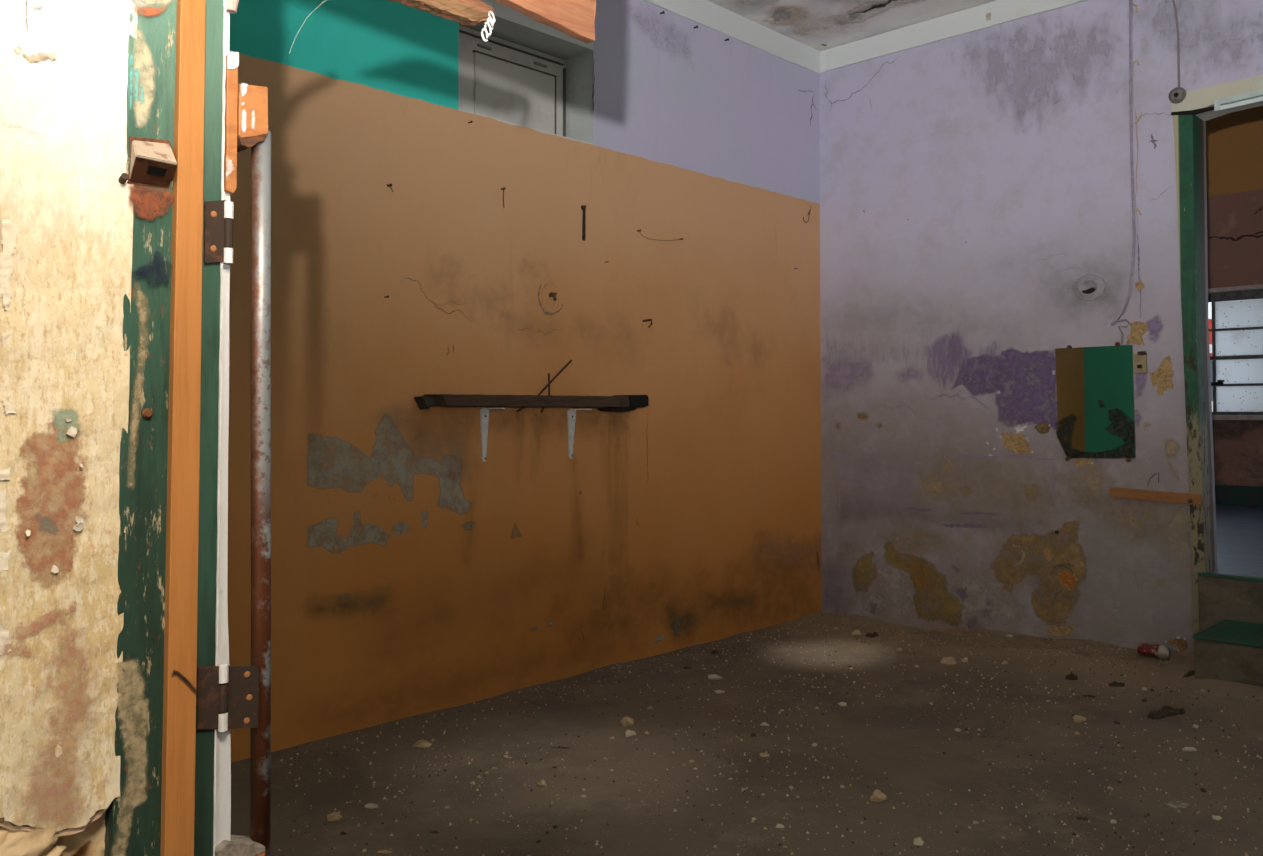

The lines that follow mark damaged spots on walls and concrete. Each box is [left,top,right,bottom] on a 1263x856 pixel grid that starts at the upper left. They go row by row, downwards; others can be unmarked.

peeling [134,23,154,126]
crack [799,58,898,126]
crack [821,0,915,46]
spalling [0,216,17,310]
crack [1208,206,1263,241]
peeling [929,334,1058,456]
peeling [0,410,86,586]
peeling [307,414,475,553]
spalling [0,632,110,856]